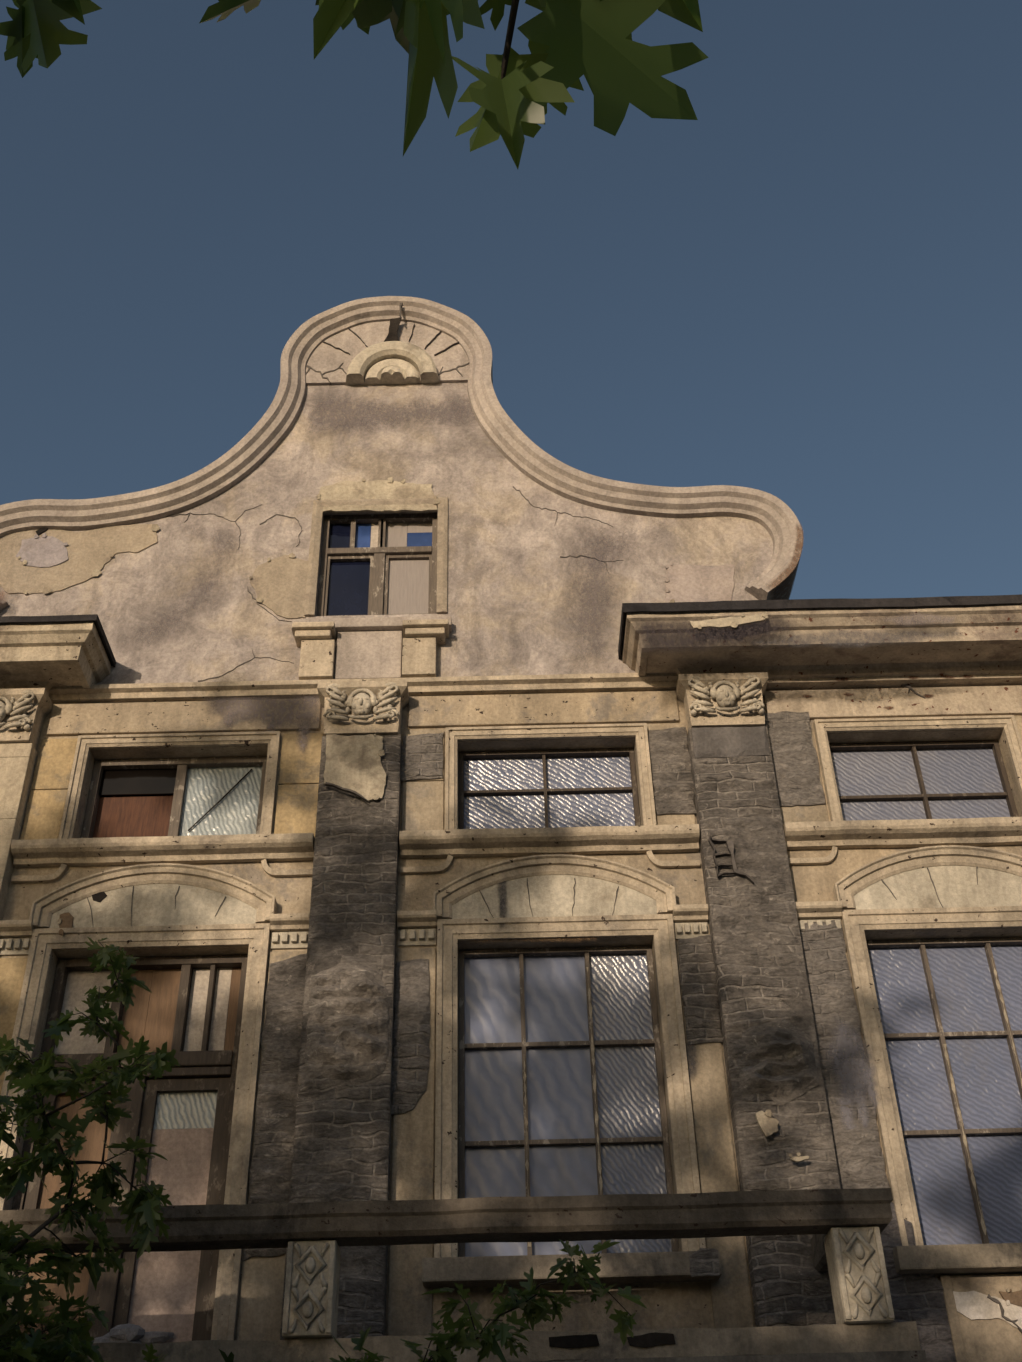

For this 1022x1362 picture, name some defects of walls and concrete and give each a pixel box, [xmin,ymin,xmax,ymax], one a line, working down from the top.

crack [166,504,302,549]
crack [513,486,613,527]
crack [560,555,623,573]
crack [247,587,292,622]
crack [198,650,294,682]
flaking render [249,733,444,1204]
flaking render [648,711,1022,1362]
flaking render [243,1248,287,1265]
flaking render [337,1245,385,1338]